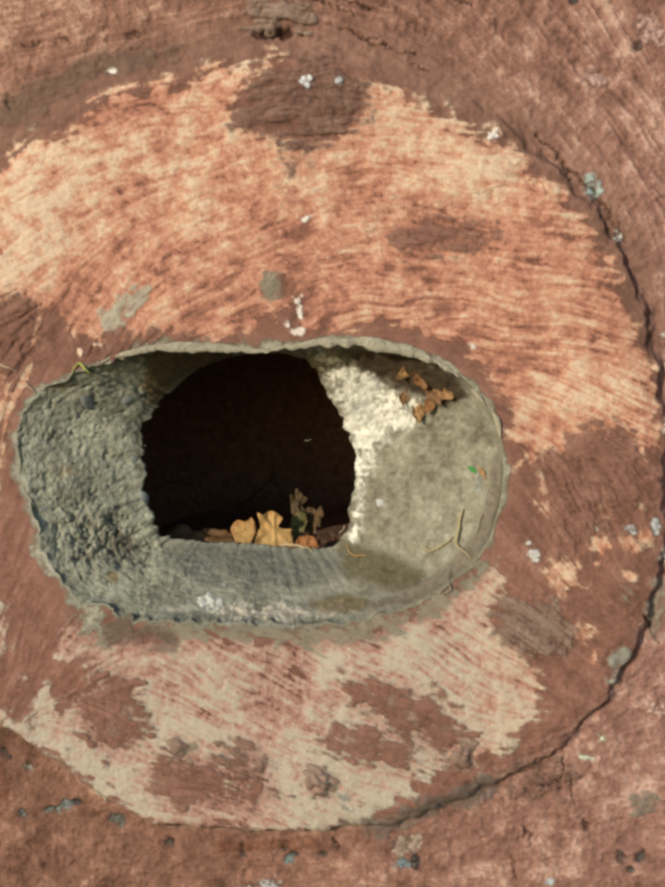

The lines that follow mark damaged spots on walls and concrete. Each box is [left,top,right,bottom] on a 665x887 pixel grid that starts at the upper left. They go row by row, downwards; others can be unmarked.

peeling [630,13,665,51]
peeling [0,45,665,617]